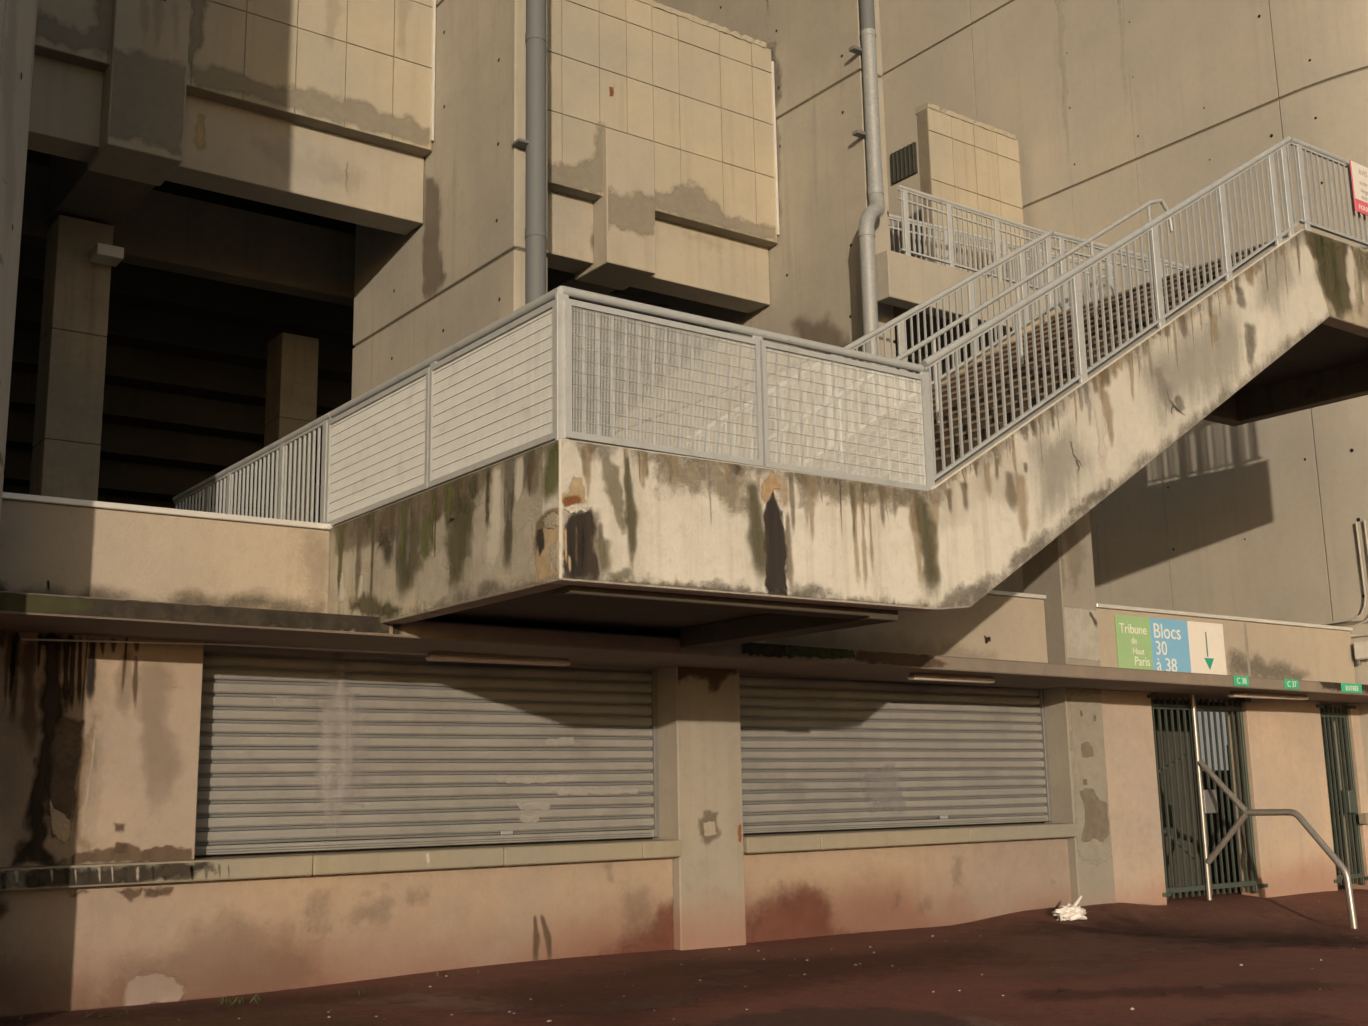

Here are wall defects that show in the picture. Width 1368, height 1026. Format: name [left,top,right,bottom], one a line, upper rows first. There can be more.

damp [1157,231,1365,334]
damp [1246,325,1272,376]
damp [1021,407,1054,438]
spalling [534,477,604,581]
damp [562,442,950,601]
damp [944,535,1045,608]
damp [0,632,229,900]
peeling [703,821,716,837]